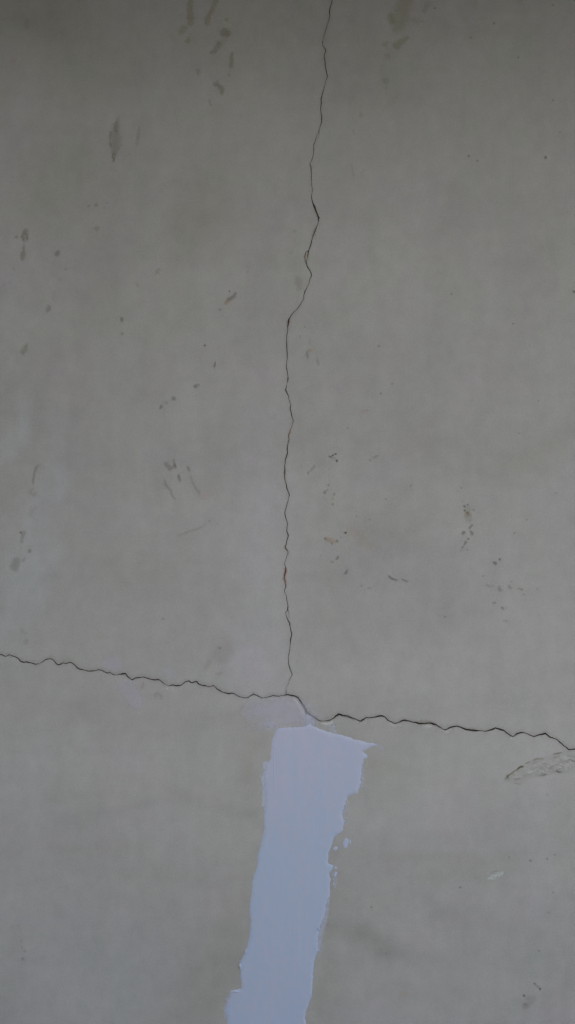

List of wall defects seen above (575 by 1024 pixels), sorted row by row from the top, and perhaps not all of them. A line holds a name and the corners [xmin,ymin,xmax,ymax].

crack [0,3,575,750]
spalling [503,752,575,785]